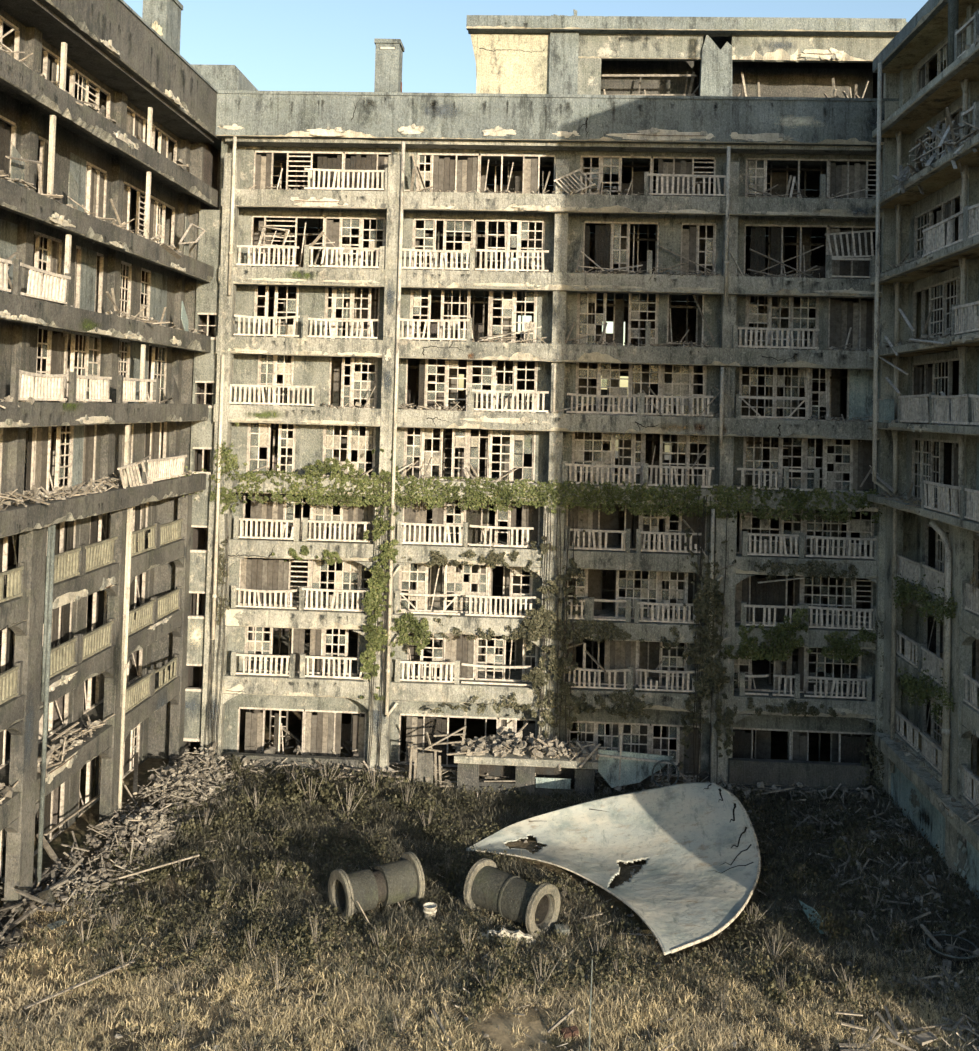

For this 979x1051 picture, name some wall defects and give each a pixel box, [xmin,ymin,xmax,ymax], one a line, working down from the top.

spalling [799,48,845,60]
damp [425,101,457,116]
spalling [307,126,347,136]
spalling [606,128,715,141]